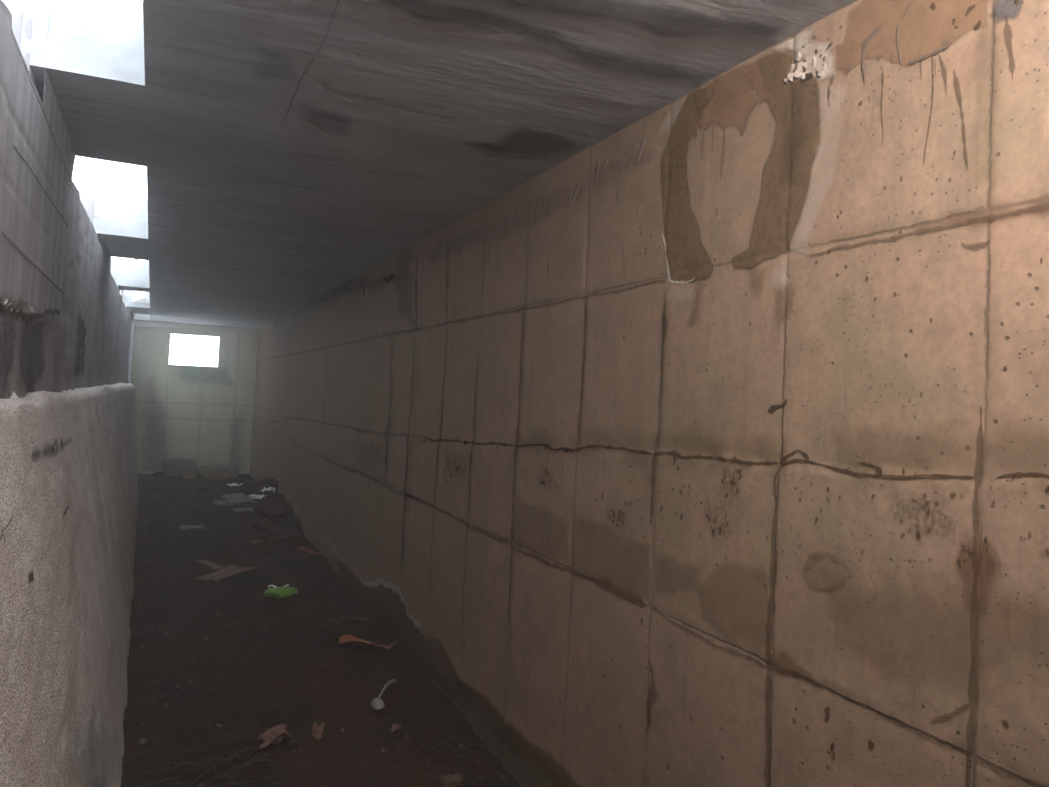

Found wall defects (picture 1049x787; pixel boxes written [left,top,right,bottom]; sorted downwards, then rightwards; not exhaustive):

water stain [366,0,985,407]
crack [805,203,1049,256]
water stain [1004,16,1014,80]
crack [268,417,1049,787]